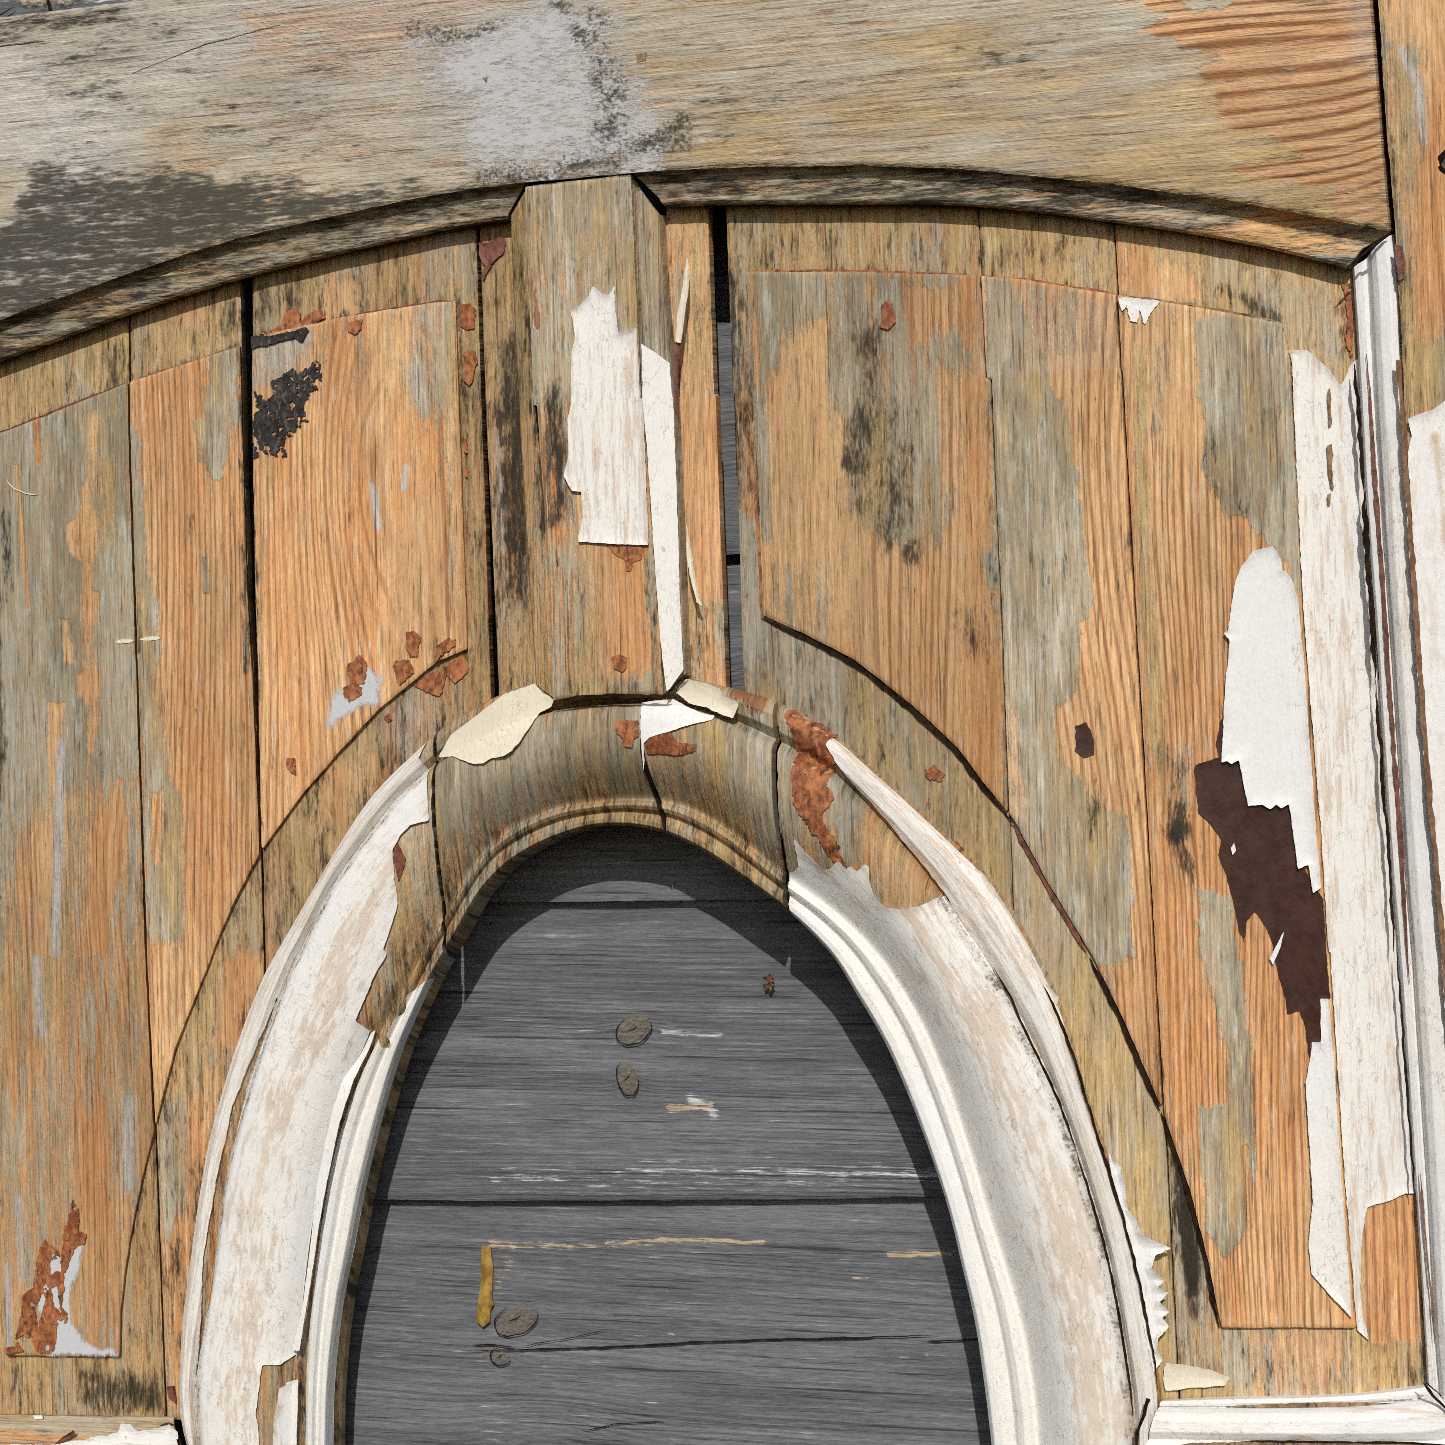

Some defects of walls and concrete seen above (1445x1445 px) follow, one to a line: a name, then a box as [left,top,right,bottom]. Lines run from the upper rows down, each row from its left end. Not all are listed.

peeling [4,1200,118,1357]
peeling [55,684,554,1445]
peeling [564,258,738,770]
peeling [754,483,1230,1445]
peeling [1194,282,1416,1340]
peeling [1408,401,1445,929]